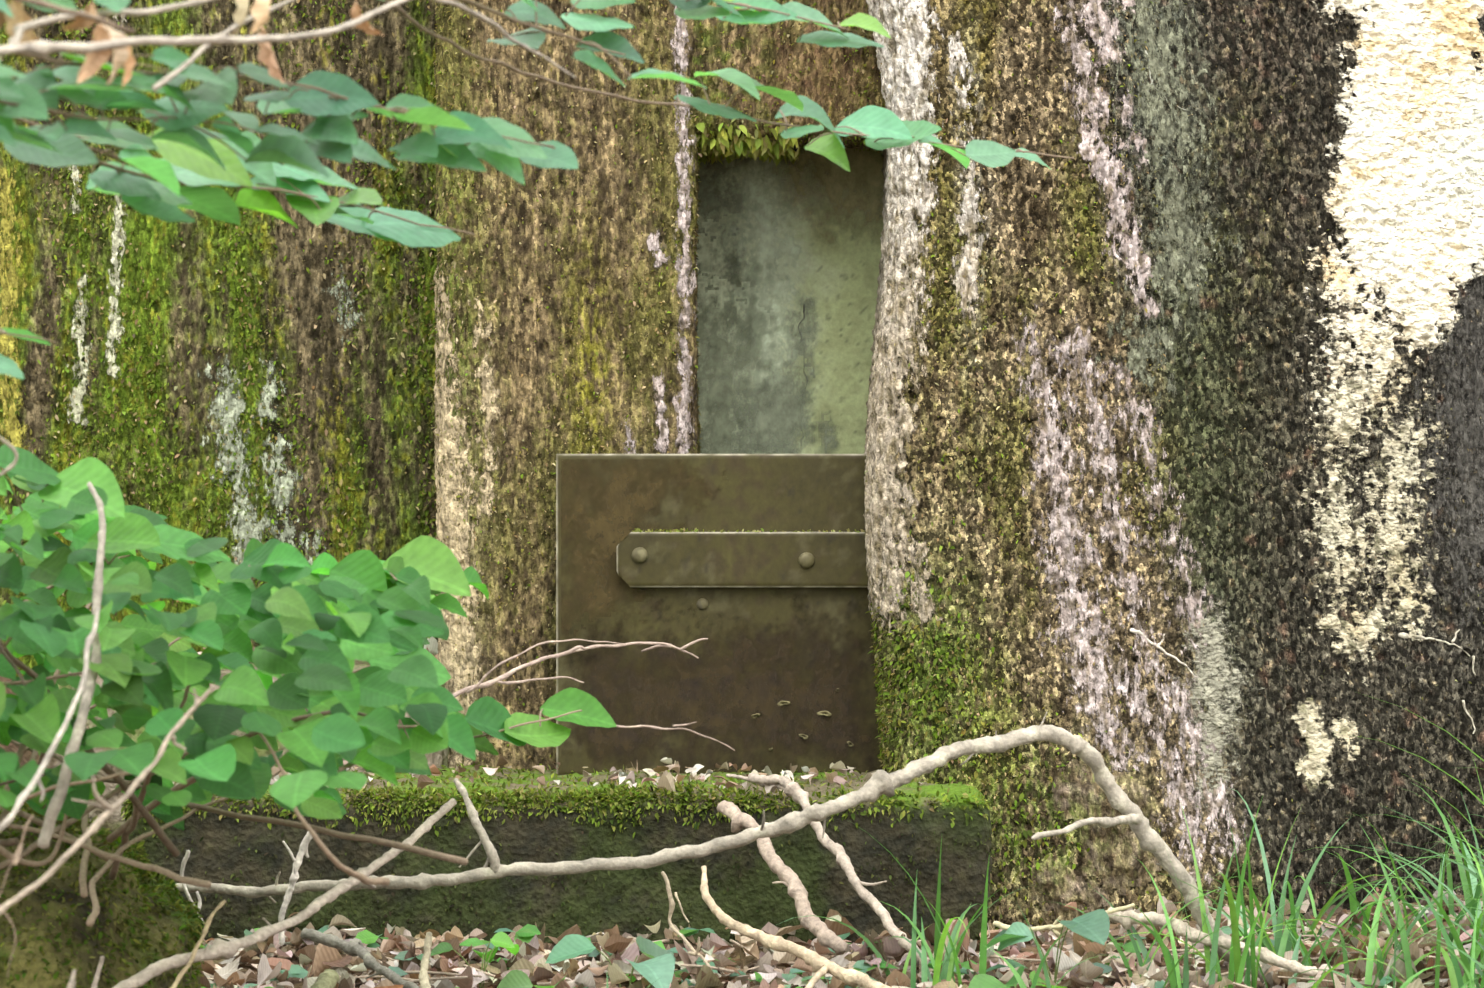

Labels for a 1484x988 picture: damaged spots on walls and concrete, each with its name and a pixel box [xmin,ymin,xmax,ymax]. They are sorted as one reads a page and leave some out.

leakage [68,165,81,214]
leakage [67,194,126,426]
leakage [323,273,362,343]
leakage [197,354,326,565]